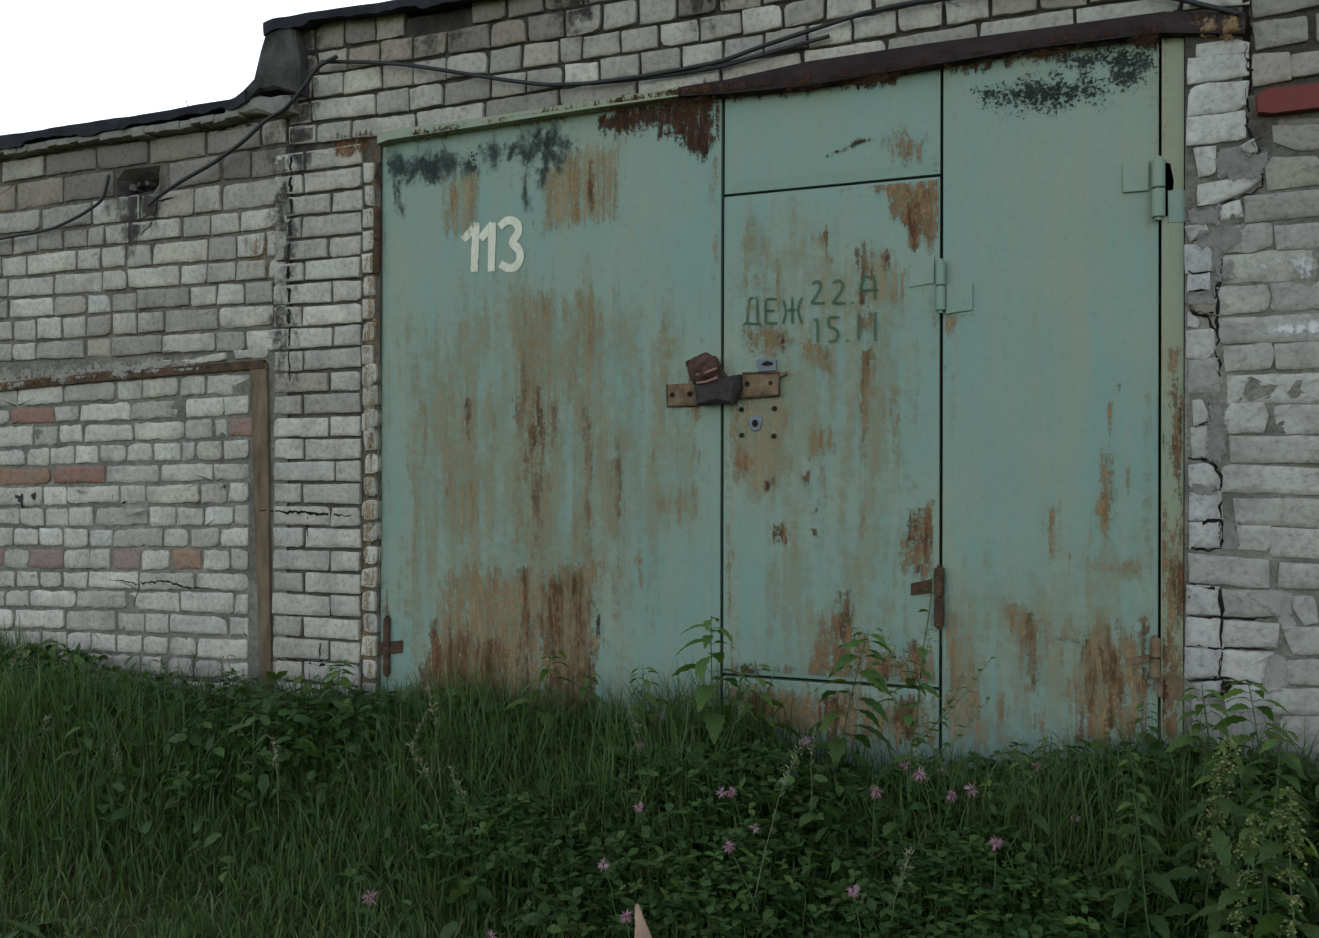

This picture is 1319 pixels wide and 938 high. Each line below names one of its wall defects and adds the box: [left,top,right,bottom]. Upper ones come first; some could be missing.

rust [1195,13,1244,42]
rust [410,23,1167,237]
rust [874,171,939,252]
rust [855,242,906,334]
rust [418,283,625,719]
rust [725,397,835,536]
rust [858,349,899,458]
rust [900,500,935,581]
rust [1002,348,1190,752]
crack [1186,258,1224,552]
rust [715,589,1009,753]
crack [1187,582,1276,697]